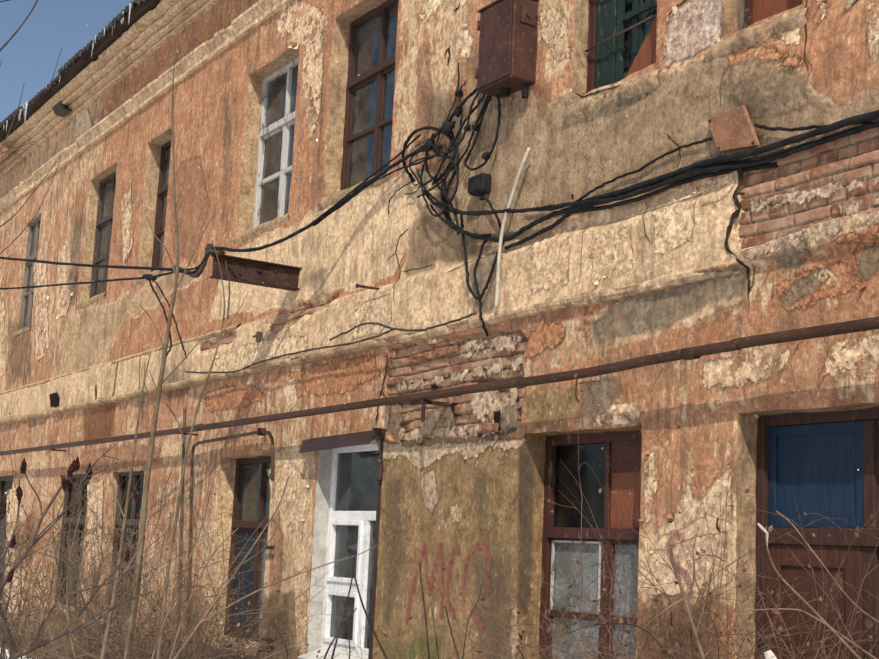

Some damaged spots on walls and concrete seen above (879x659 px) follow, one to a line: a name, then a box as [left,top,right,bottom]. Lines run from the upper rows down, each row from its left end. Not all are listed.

peeling [276,0,330,141]
peeling [662,0,723,67]
crack [804,1,812,82]
crack [724,168,755,308]
spalling [652,127,879,312]
spalling [282,319,566,523]
water stain [518,446,534,604]
peeling [639,448,659,523]
water stain [593,268,746,343]
peeling [648,463,734,595]
peeling [699,342,800,391]
peeling [819,332,879,378]